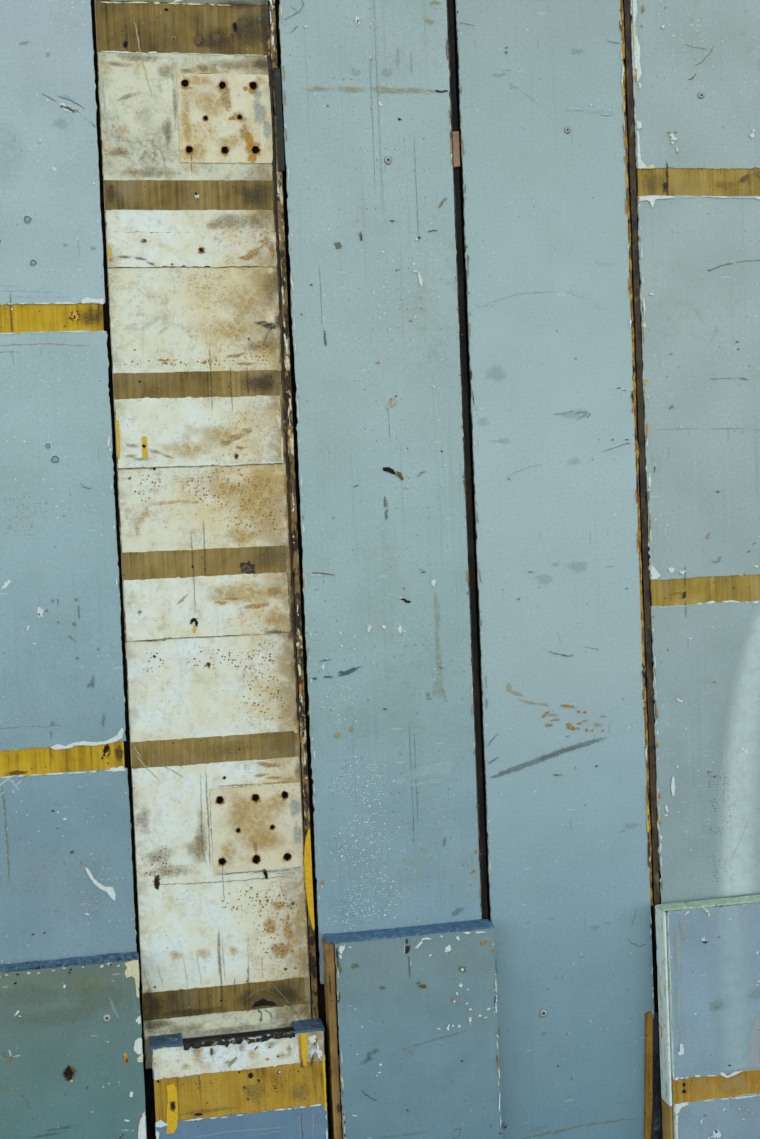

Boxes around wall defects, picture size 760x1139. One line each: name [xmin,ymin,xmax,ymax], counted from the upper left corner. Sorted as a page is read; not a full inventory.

peeling [102,0,231,11]
peeling [269,0,286,105]
rust [203,82,260,163]
peeling [577,0,760,214]
rust [187,472,291,538]
rust [188,644,283,719]
peeling [0,728,126,778]
rust [227,762,288,805]
rust [542,704,604,737]
peeling [646,766,679,889]
rust [222,887,297,970]
peeling [134,1038,143,1062]